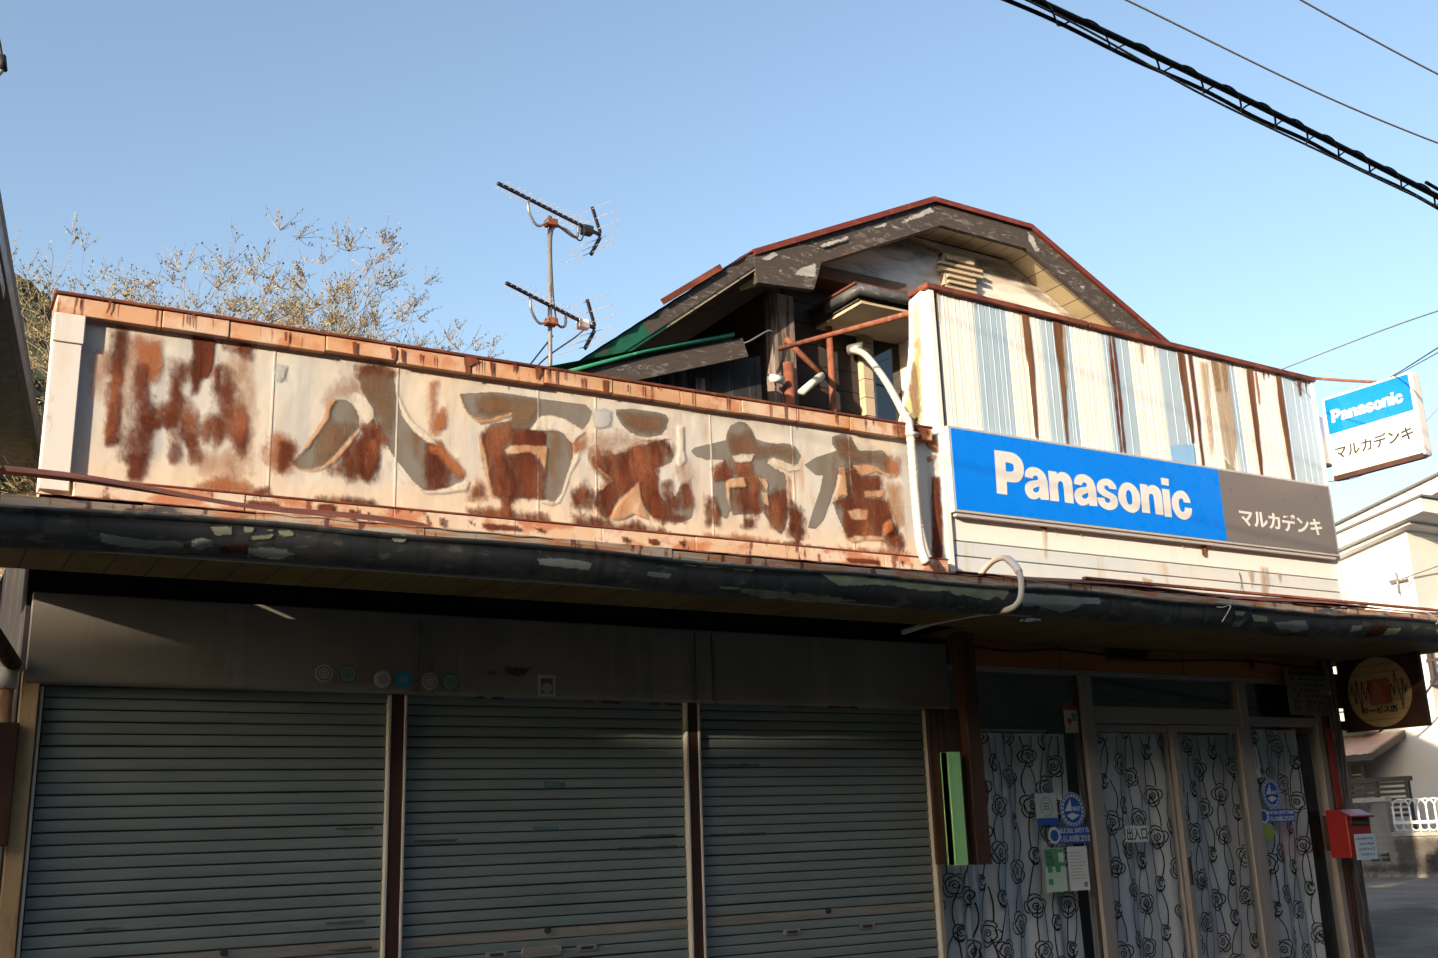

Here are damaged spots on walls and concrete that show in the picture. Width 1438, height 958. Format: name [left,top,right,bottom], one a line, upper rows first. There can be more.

rust [95,314,280,507]
rust [352,341,549,532]
rust [1021,312,1038,438]
rust [1052,319,1069,444]
rust [1177,352,1236,466]
rust [1246,368,1307,480]
peeling [100,533,184,549]
peeling [211,526,294,560]
peeling [537,558,593,570]
rust [571,440,809,546]
rust [836,457,907,566]
peeling [1231,611,1309,633]